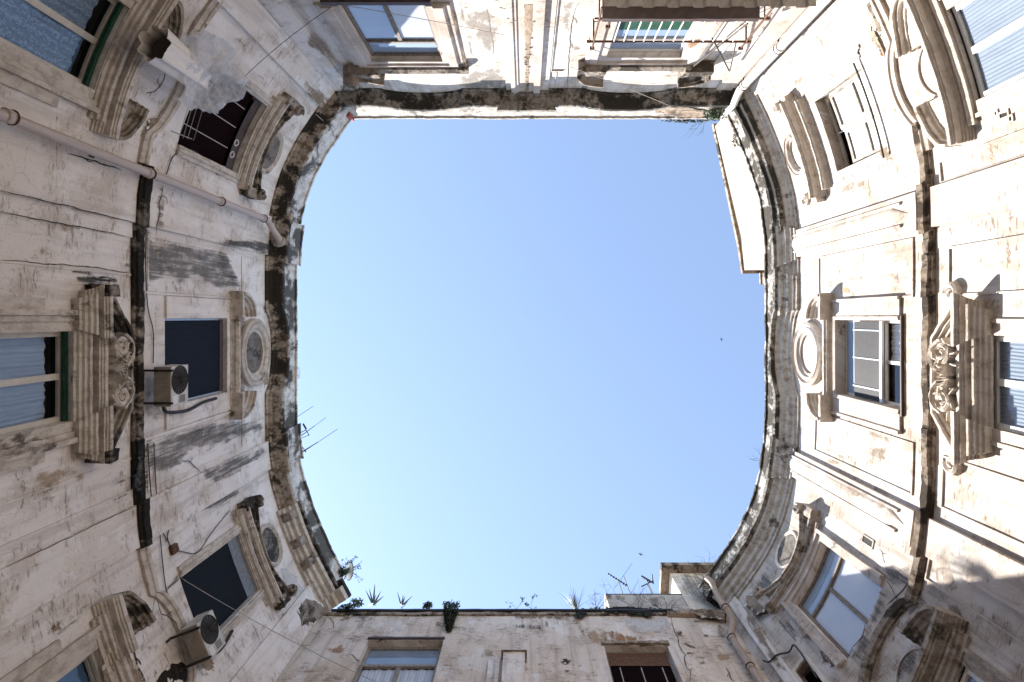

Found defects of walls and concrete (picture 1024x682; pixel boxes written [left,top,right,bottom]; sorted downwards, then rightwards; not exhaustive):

water stain [148,240,270,287]
water stain [118,421,263,495]